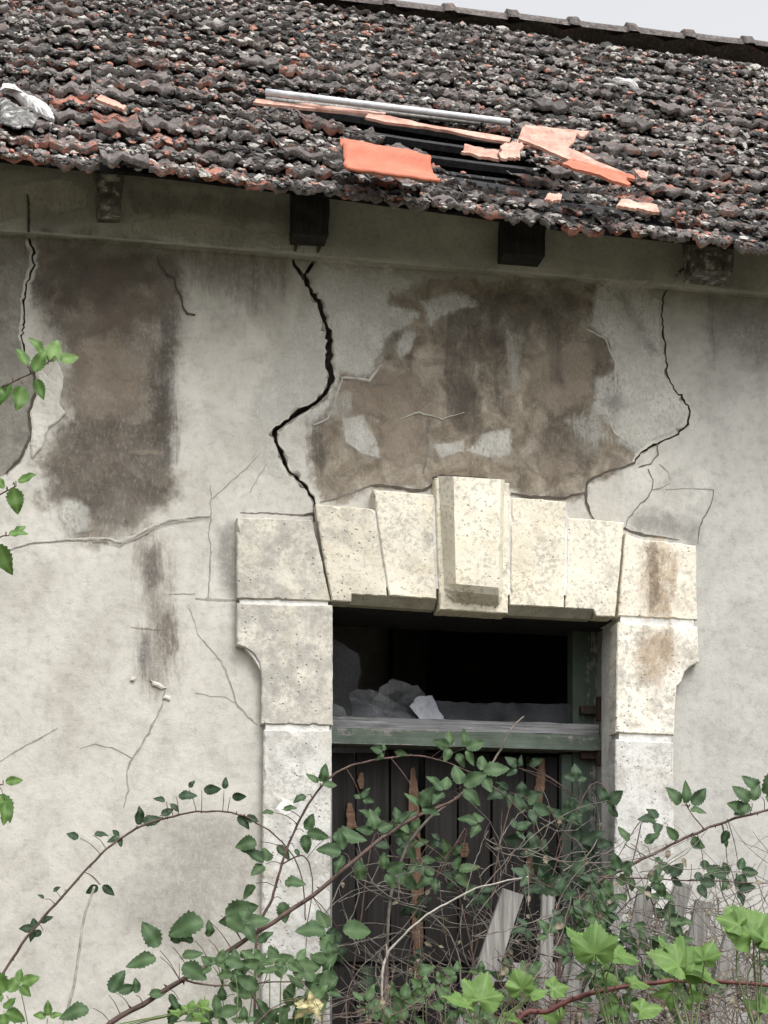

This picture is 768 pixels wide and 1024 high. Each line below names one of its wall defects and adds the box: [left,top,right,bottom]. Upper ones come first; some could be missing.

crack [19,194,36,351]
water stain [36,243,178,543]
crack [9,245,487,725]
peeling [310,278,636,503]
crack [511,267,714,540]
crack [0,728,57,762]
crack [80,691,165,808]